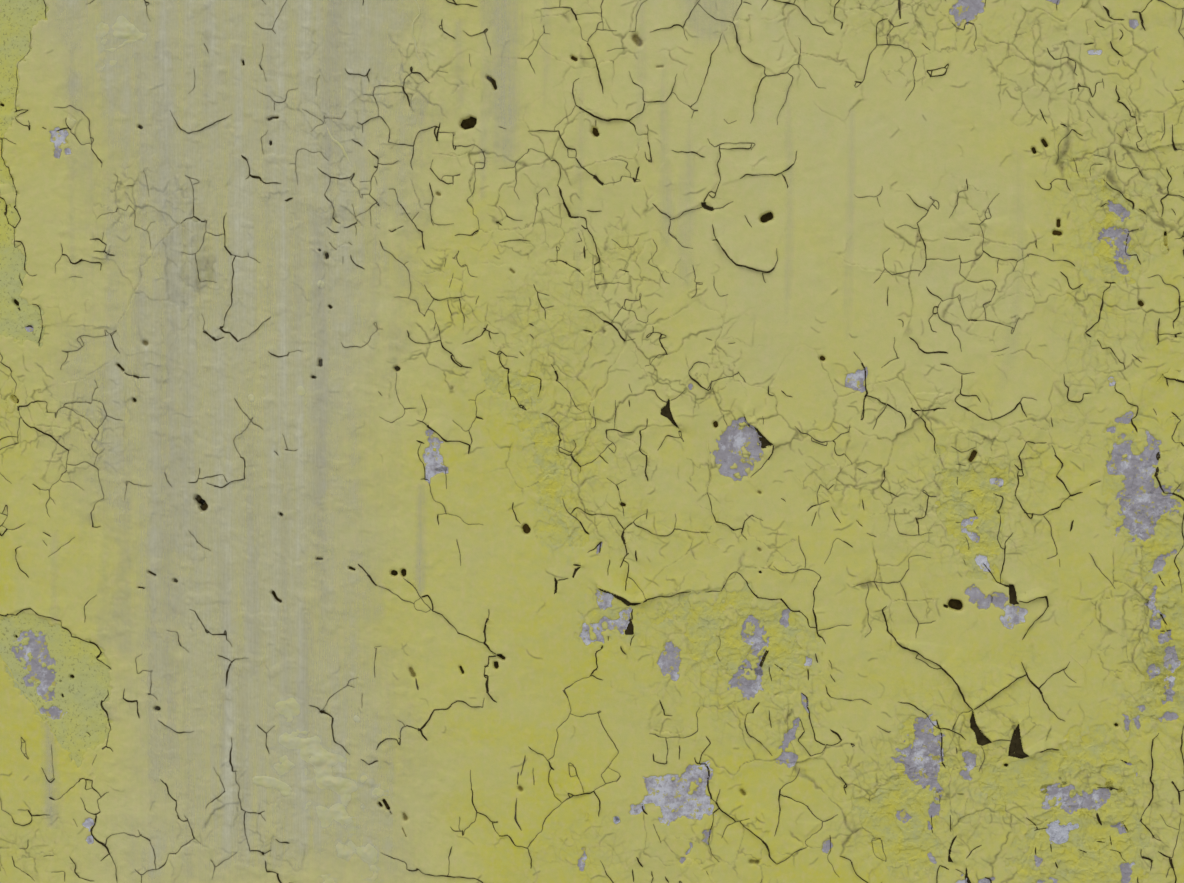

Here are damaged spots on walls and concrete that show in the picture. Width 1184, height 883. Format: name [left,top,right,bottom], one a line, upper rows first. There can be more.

peeling [0,0,49,348]
crack [1,0,152,378]
crack [0,353,298,578]
crack [241,0,843,599]
spalling [710,415,774,481]
crack [601,0,1184,883]
peeling [0,611,113,767]
crack [0,596,289,883]
crack [380,636,634,883]
spalling [629,761,714,863]
peeling [580,583,823,768]
peeling [851,411,1184,883]